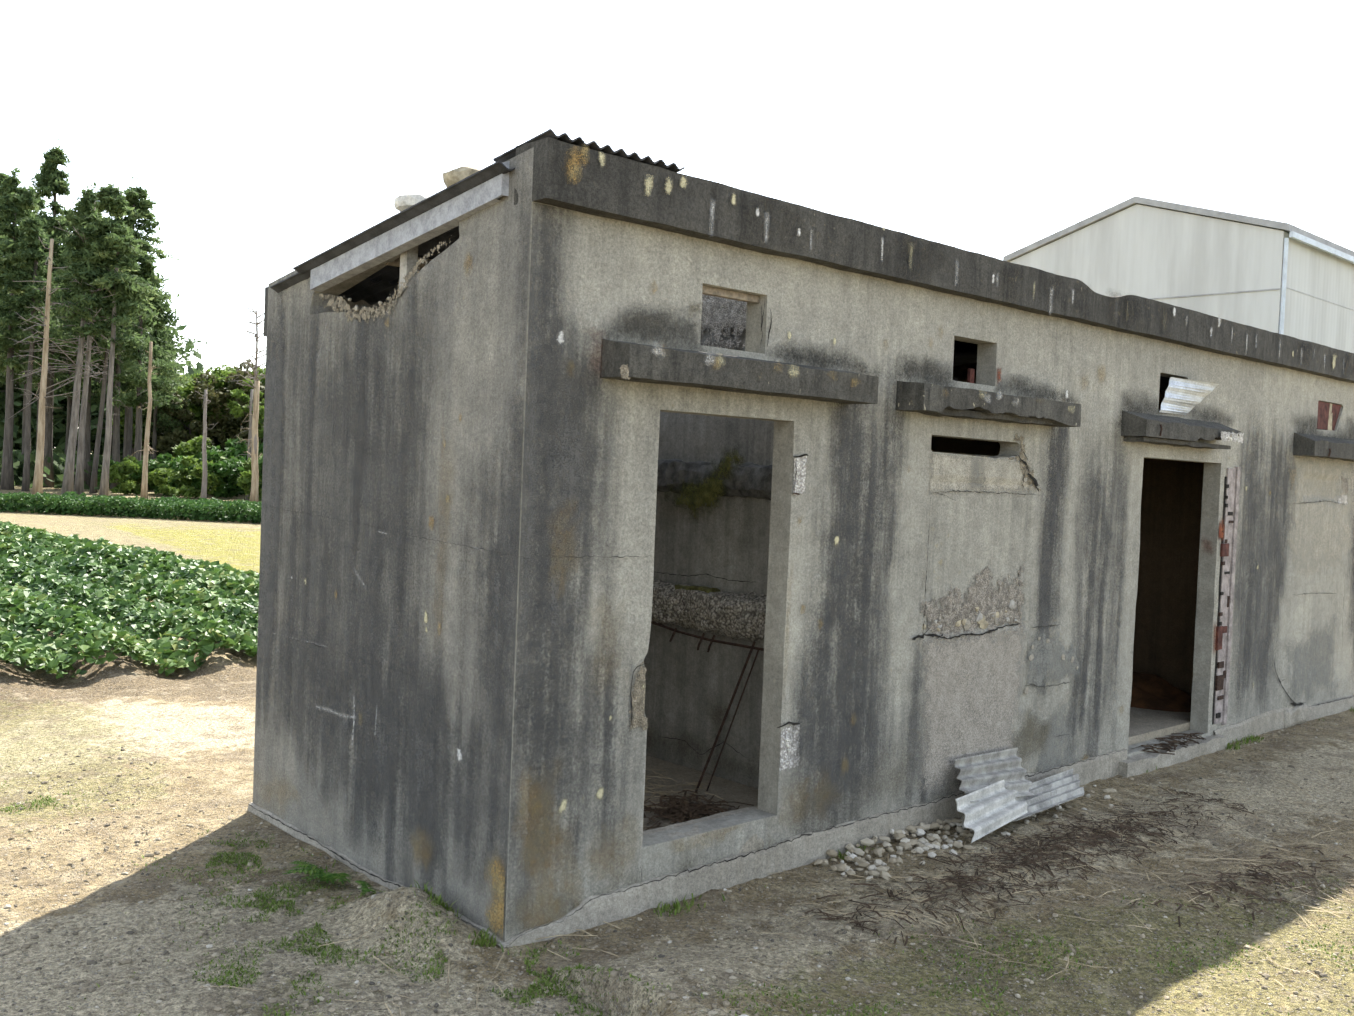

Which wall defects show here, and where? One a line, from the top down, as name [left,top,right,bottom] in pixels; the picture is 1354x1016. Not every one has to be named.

spalling [319,235,452,323]
leakage [607,308,698,349]
leakage [256,221,615,936]
leakage [797,404,904,814]
peeling [920,560,1031,791]
leakage [1235,433,1289,698]